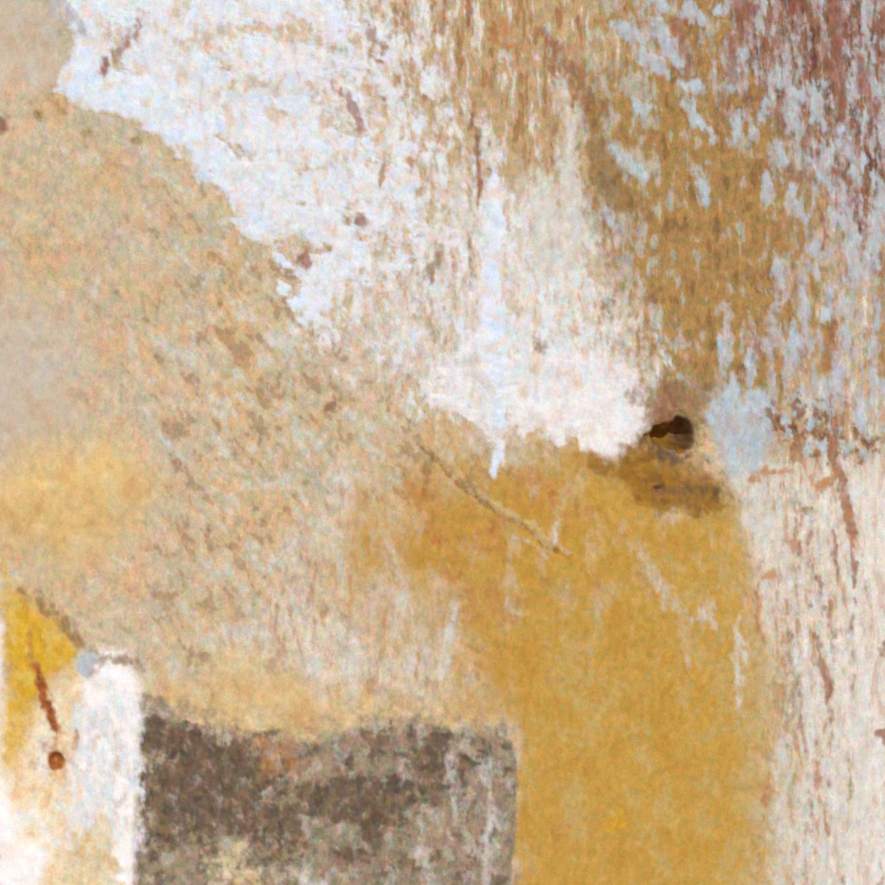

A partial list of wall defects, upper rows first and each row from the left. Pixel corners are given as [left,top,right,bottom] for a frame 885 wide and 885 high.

peeling [44,0,679,453]
peeling [605,0,885,614]
crack [404,434,567,568]
corrosion [21,620,82,785]
damp [141,712,515,885]